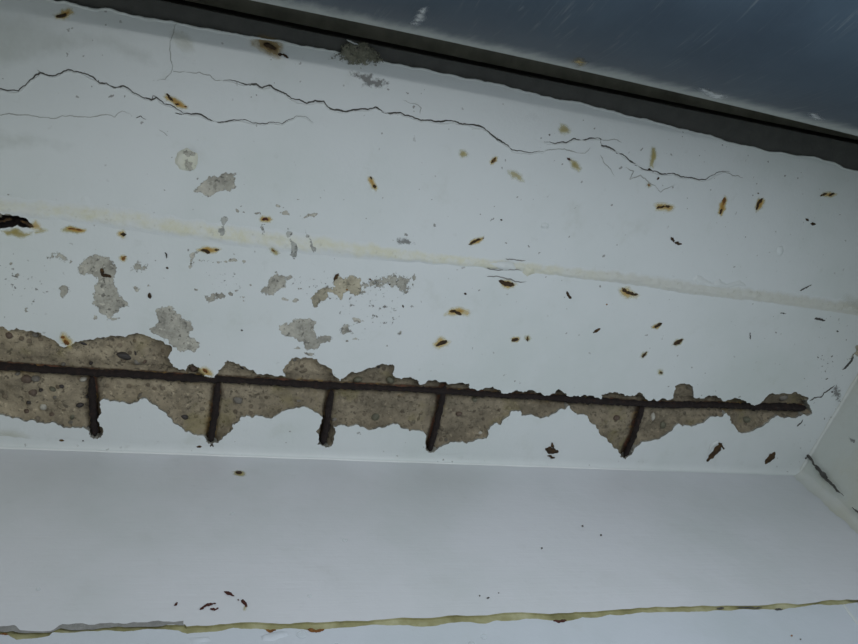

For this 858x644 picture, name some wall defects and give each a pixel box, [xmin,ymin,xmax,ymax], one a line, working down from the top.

rust [165,93,187,108]
crack [0,24,742,192]
peeling [194,172,236,197]
spalling [0,213,34,228]
rust [4,222,44,237]
peeling [47,253,128,320]
peeling [194,289,244,303]
peeling [250,271,302,302]
peeling [311,273,416,308]
spalling [0,306,811,454]
rust [706,440,725,462]
crack [805,454,858,513]